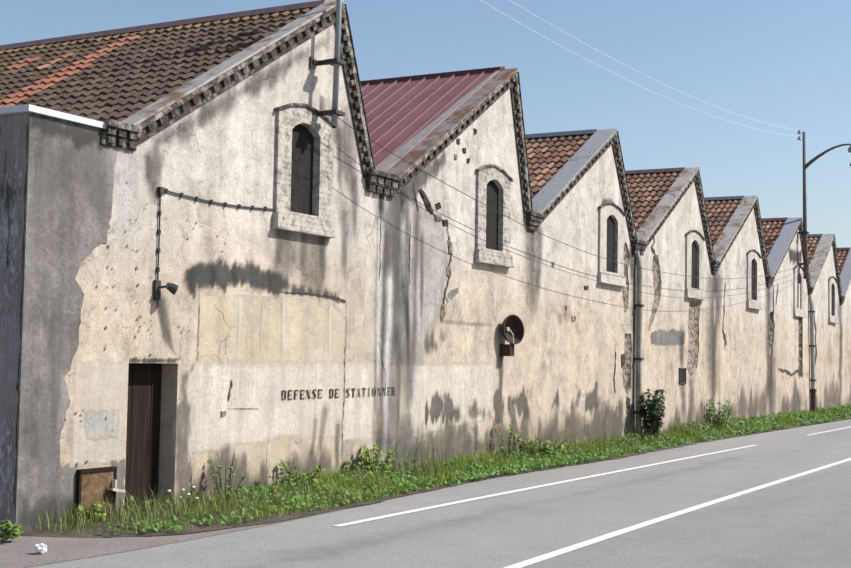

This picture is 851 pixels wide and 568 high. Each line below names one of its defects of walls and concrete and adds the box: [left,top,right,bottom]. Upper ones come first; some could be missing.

peeling [0,157,22,334]
water stain [376,154,529,472]
flaking render [649,237,662,330]
flaking render [687,300,700,377]
crack [778,314,817,376]
water stain [539,382,632,449]
peeling [0,416,15,515]